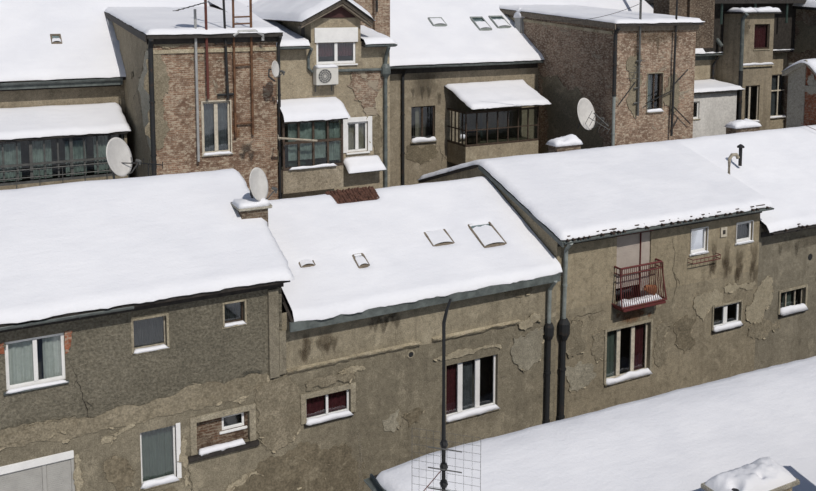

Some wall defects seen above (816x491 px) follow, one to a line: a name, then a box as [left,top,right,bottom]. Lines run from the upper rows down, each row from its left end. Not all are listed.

flaking render [131,49,151,151]
flaking render [348,71,384,156]
flaking render [433,314,544,372]
flaking render [673,275,774,354]
flaking render [0,373,270,451]
flaking render [226,471,264,491]